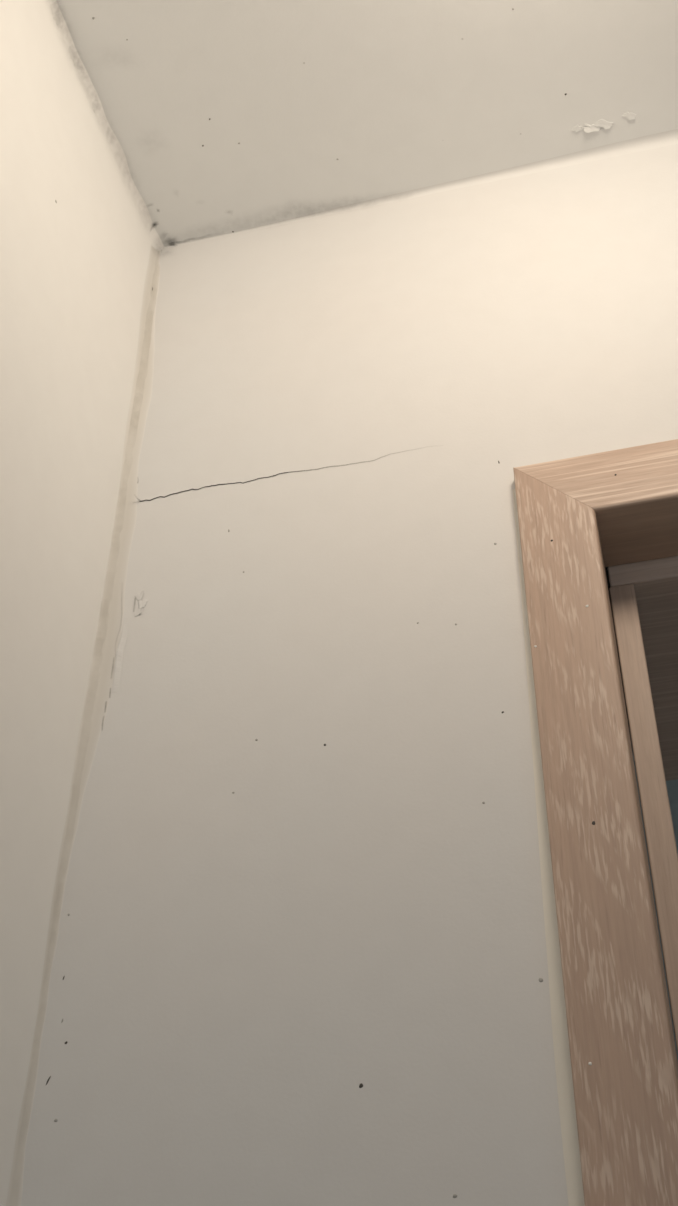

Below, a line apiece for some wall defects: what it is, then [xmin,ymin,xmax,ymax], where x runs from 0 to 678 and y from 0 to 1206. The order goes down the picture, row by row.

crack [140,466,333,502]